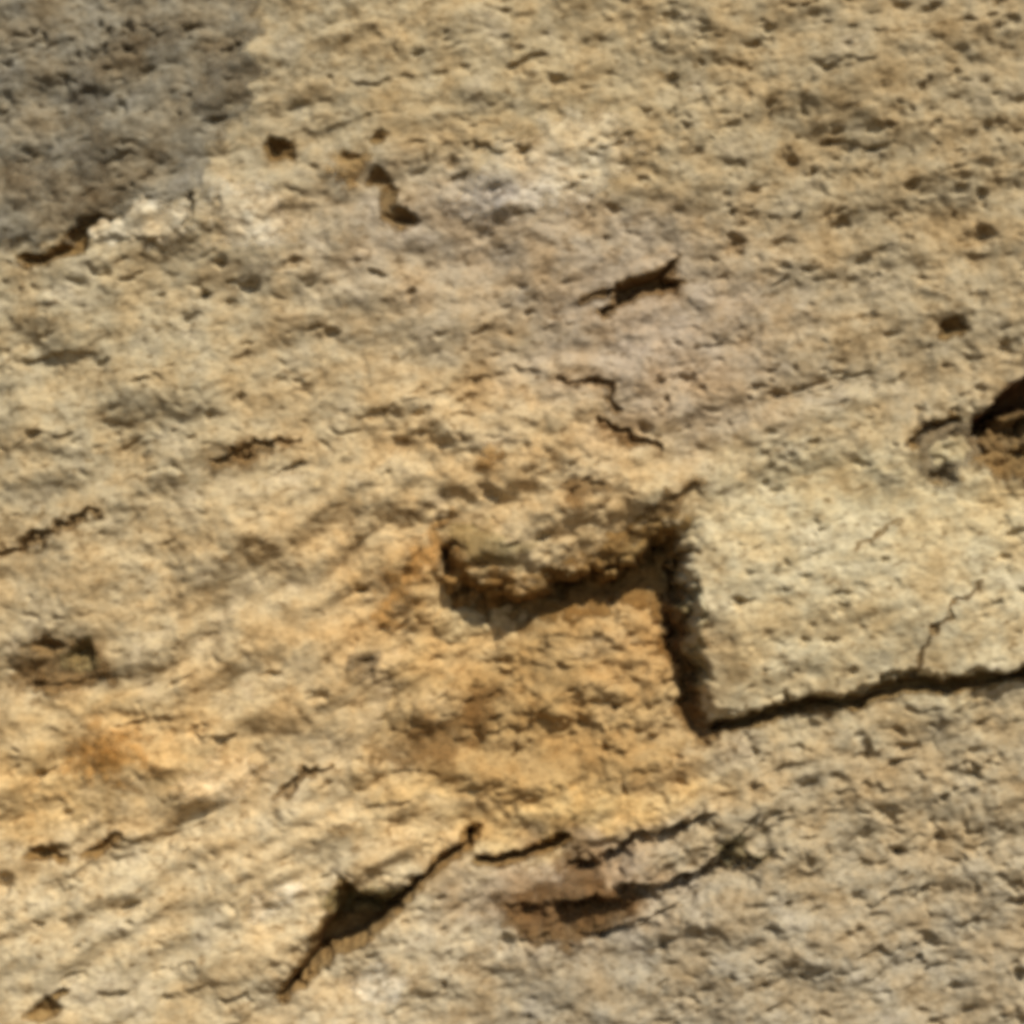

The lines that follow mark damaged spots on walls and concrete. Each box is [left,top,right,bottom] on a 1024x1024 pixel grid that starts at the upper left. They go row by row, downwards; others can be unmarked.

leakage [0,0,289,255]
crack [854,518,903,551]
spalling [343,556,707,807]
crack [660,559,1024,747]
crack [275,820,574,1004]